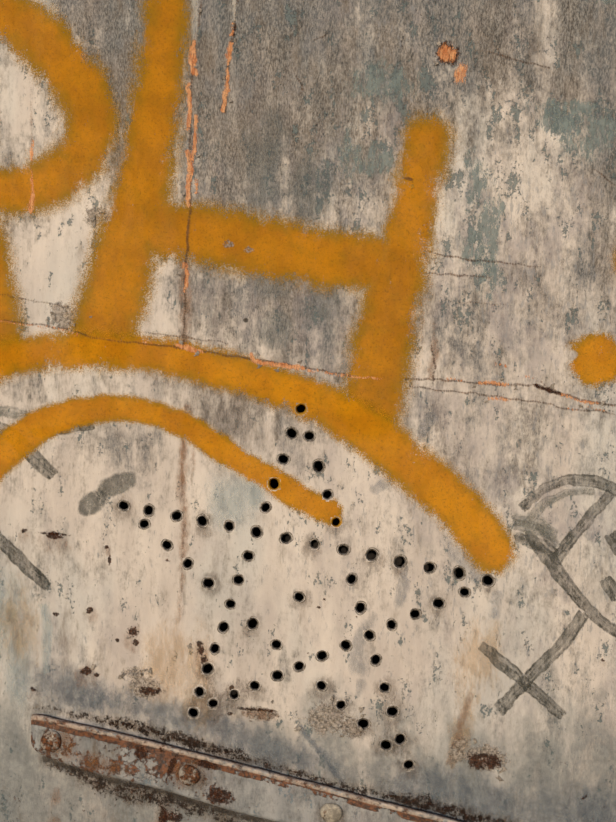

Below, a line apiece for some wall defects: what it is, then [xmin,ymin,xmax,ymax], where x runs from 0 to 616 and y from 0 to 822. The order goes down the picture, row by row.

peeling [433,39,466,82]
crack [127,335,378,382]
crack [405,345,615,413]
rust [48,707,504,822]